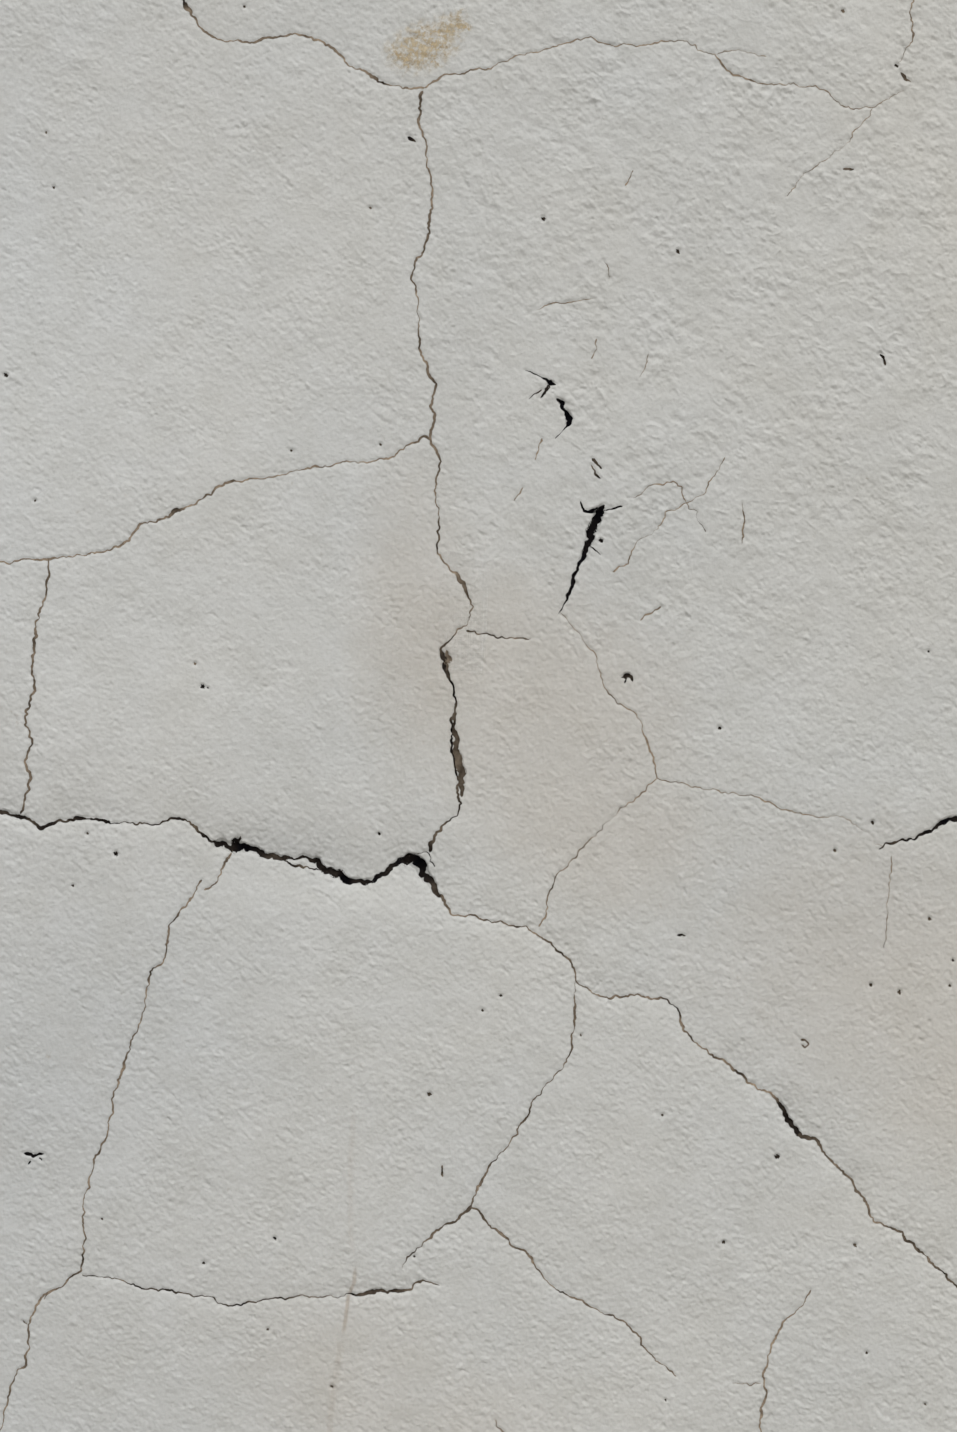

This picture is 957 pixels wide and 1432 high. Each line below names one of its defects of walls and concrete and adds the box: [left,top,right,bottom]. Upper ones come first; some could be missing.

crack [183,0,799,90]
crack [806,85,902,144]
crack [902,0,915,58]
crack [0,91,474,867]
crack [591,458,602,479]
crack [613,457,725,572]
crack [466,630,531,640]
crack [539,501,866,926]
crack [0,810,957,1288]
crack [0,880,438,1430]
crack [402,989,676,1376]
crack [738,1290,811,1432]